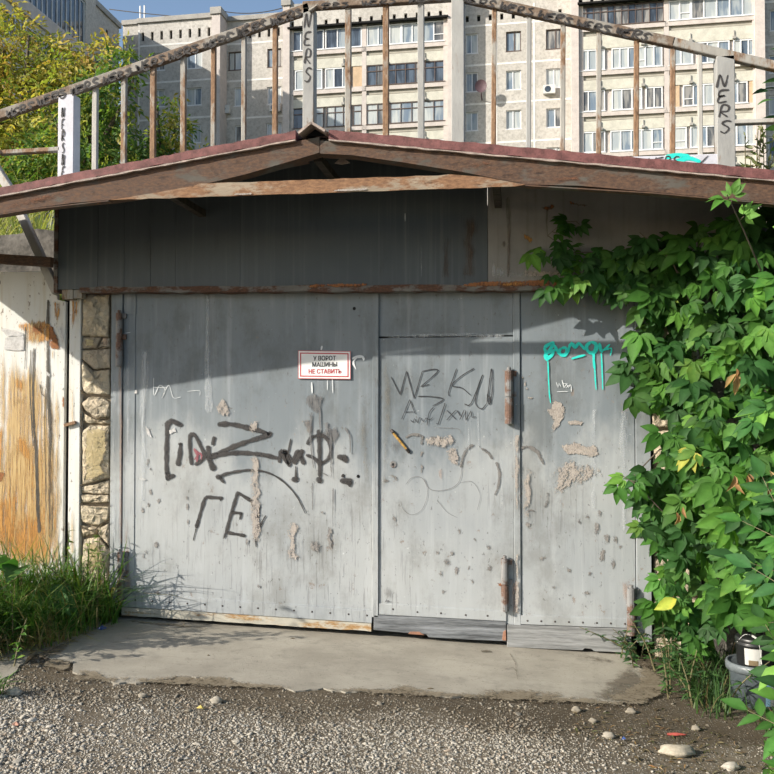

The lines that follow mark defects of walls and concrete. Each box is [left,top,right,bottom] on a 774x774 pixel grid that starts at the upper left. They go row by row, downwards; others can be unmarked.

rust [19,303,60,357]
peeling [547,399,583,432]
rust [0,369,73,566]
peeling [552,441,602,494]